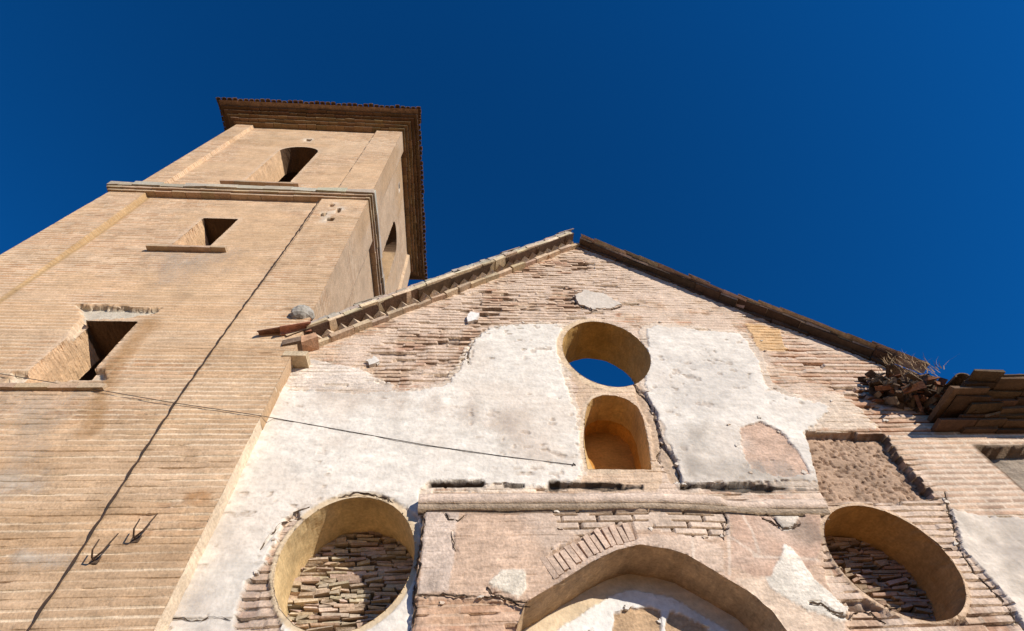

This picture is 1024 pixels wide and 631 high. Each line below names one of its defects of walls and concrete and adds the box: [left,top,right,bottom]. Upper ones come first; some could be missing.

crack [632,379,680,483]
spalling [319,247,1018,631]
spalling [238,516,305,631]